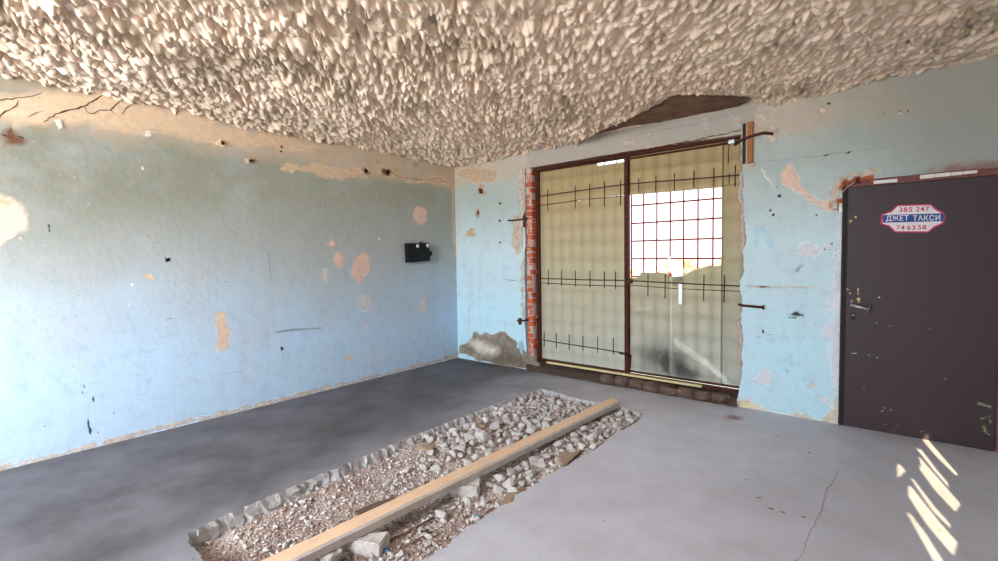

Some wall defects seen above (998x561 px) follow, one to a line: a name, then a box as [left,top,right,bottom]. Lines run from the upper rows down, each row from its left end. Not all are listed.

crack [0,92,132,122]
peeling [0,93,311,152]
peeling [778,165,882,216]
flaking render [0,163,539,471]
peeling [737,266,860,424]